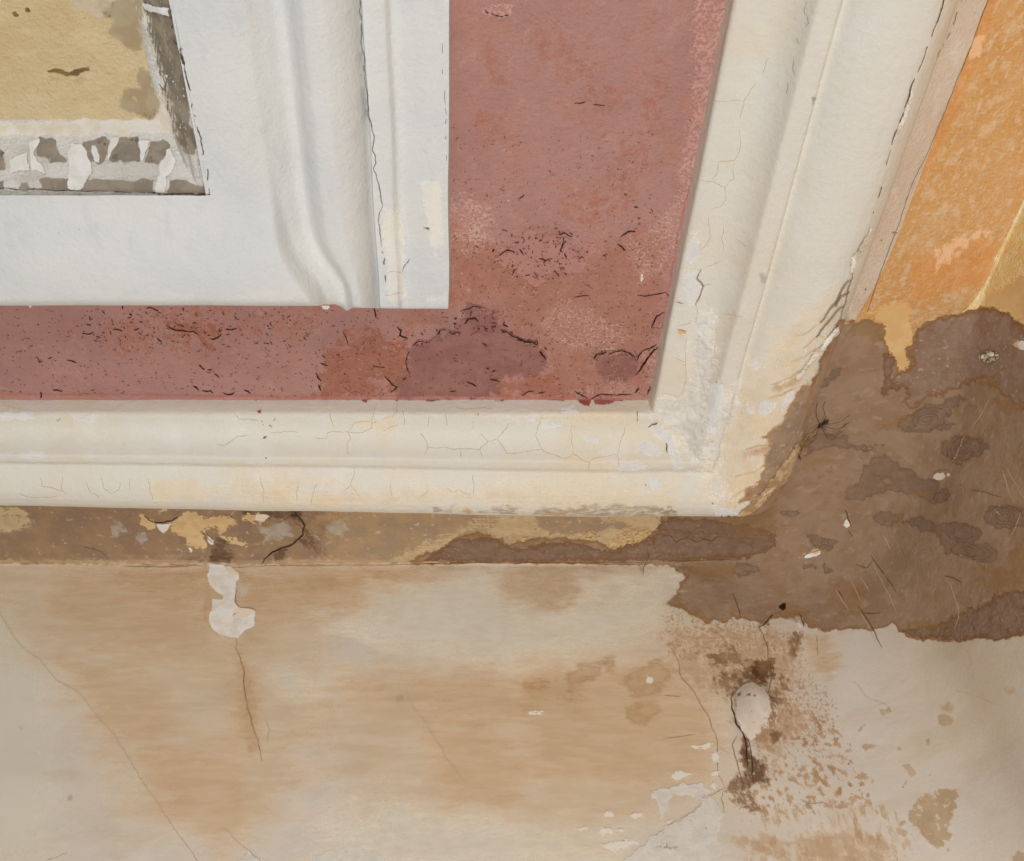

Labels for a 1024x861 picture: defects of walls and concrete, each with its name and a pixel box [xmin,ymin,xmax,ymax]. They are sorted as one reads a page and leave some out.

crack [359,1,386,282]
crack [856,0,989,312]
crack [193,365,251,395]
crack [575,292,669,400]
peeling [139,509,269,552]
damp [0,306,1024,657]
peeling [395,515,661,559]
flaking render [207,563,256,638]
peeling [579,742,723,861]
crack [670,647,753,810]
damp [725,737,769,812]
damp [707,643,792,707]